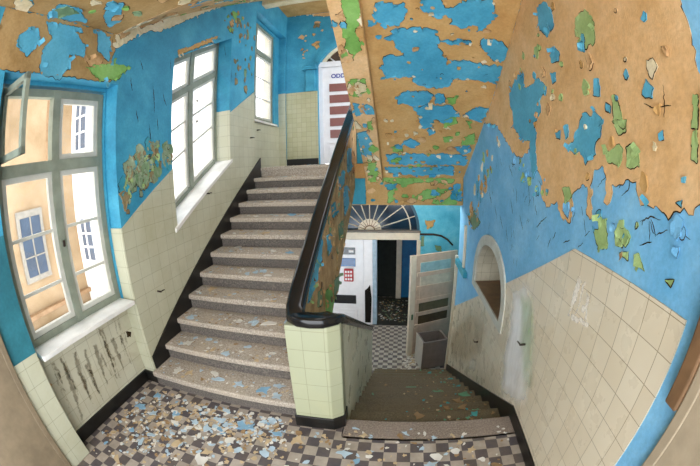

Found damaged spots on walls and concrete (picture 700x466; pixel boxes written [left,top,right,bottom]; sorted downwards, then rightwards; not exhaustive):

peeling [0,0,259,94]
peeling [118,136,173,215]
peeling [294,0,700,313]
crack [483,159,590,263]
crack [640,216,667,246]
damp [505,293,529,395]